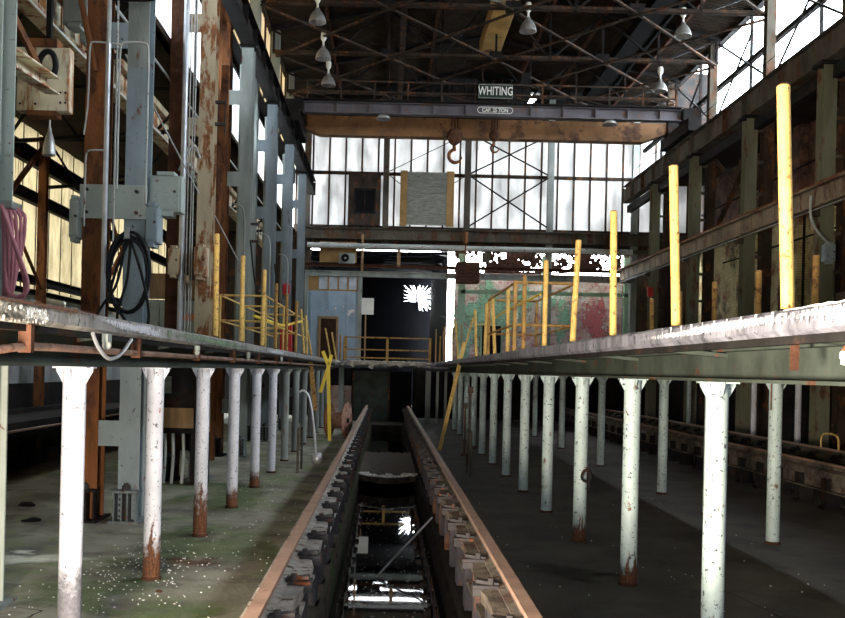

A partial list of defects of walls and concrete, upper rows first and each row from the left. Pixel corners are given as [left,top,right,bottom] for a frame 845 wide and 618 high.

peeling [443,280,541,358]
peeling [551,289,619,343]
corrosion [193,484,208,535]
corrosion [142,522,161,578]
corrosion [619,553,637,584]